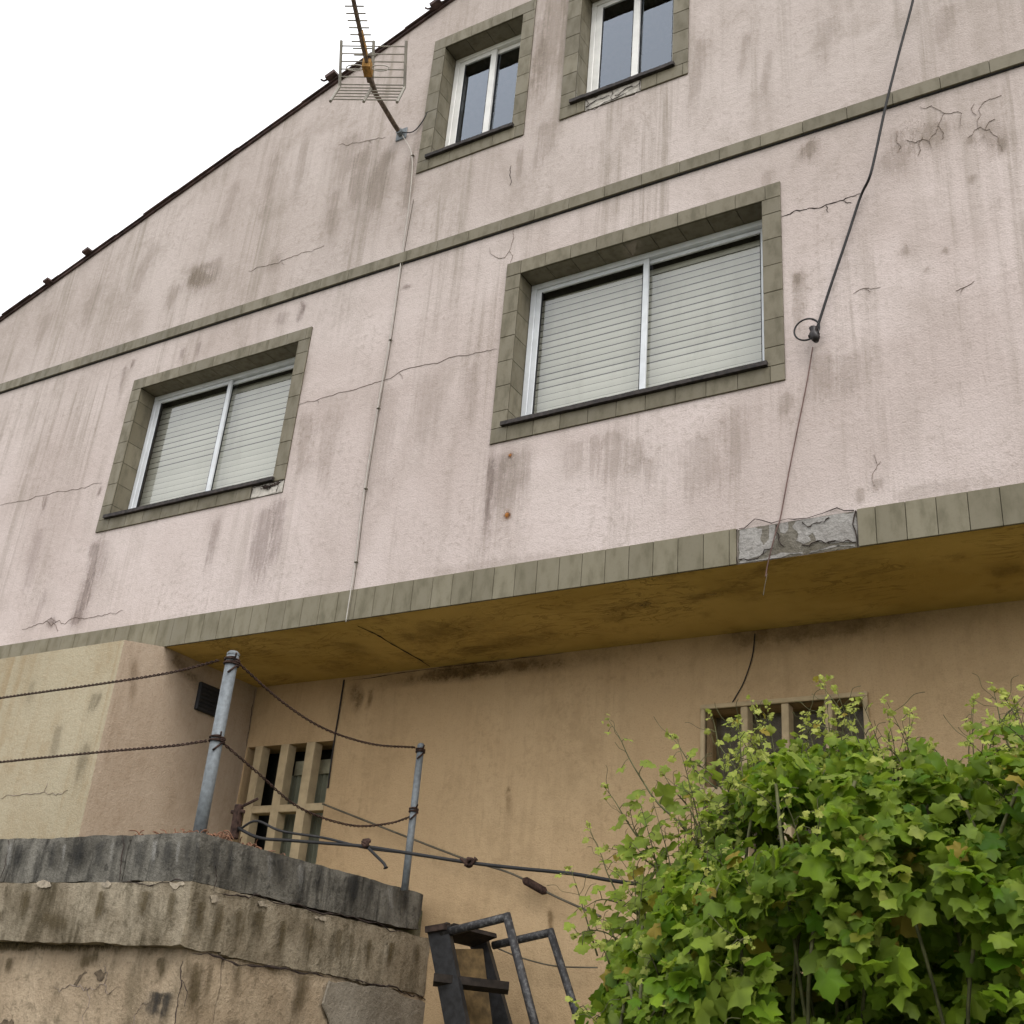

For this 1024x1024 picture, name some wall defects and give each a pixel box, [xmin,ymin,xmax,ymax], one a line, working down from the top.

crack [896,95,1002,155]
crack [782,193,860,217]
crack [301,349,493,404]
peeling [736,507,858,564]
crack [22,612,118,631]
damp [411,660,555,680]